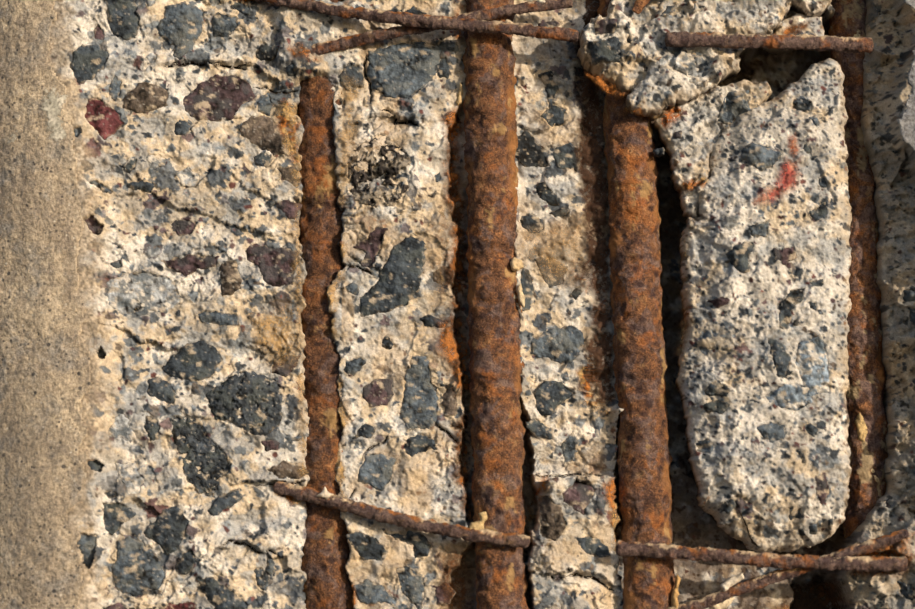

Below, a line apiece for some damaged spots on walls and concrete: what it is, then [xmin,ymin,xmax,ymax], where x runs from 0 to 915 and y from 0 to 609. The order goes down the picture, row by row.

rust [784,23,807,35]
spalling [48,0,477,609]
rust [326,271,341,338]
spalling [511,0,624,609]
spalling [651,0,915,609]
rust [453,415,472,517]
rust [605,479,620,543]
rust [438,551,474,609]
rust [789,577,850,609]
rust [857,539,911,560]